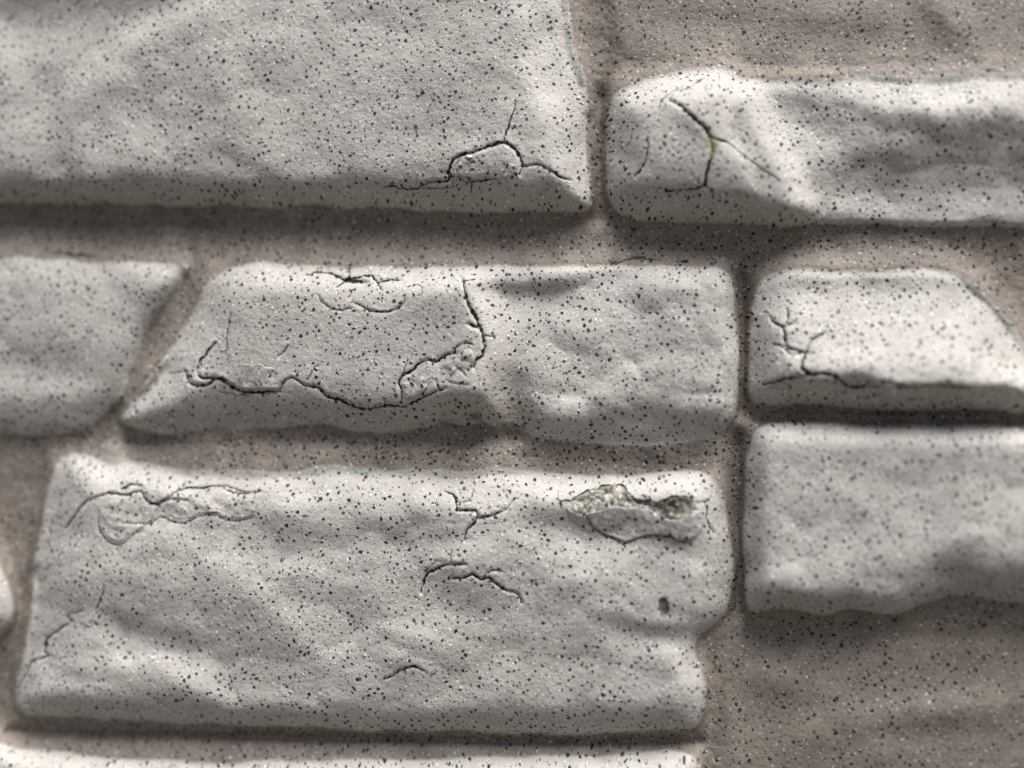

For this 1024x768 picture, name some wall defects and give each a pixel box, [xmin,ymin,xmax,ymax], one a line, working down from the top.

crack [384,103,570,193]
crack [658,78,779,198]
crack [306,268,423,313]
crack [169,278,494,411]
crack [766,310,968,389]
crack [420,491,522,603]
spalling [557,479,705,545]